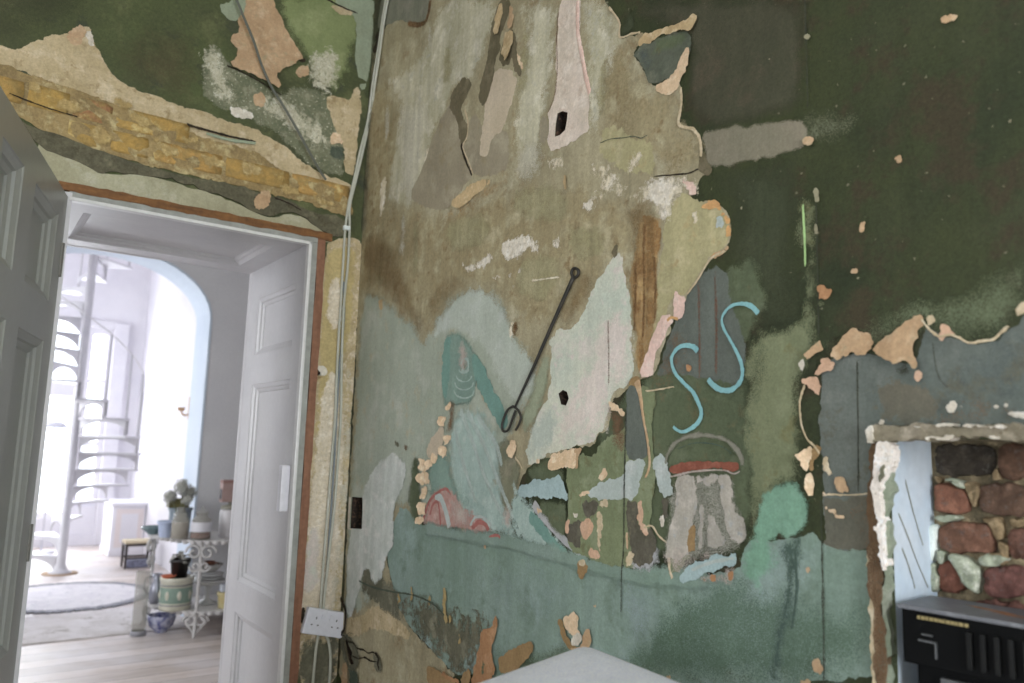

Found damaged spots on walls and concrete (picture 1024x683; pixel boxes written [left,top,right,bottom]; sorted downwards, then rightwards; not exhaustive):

crack [9,93,78,117]
leakage [198,44,345,176]
crack [187,123,256,145]
crack [460,142,472,176]
peeling [0,0,731,683]
flaking render [865,419,901,571]
peeling [800,658,823,683]